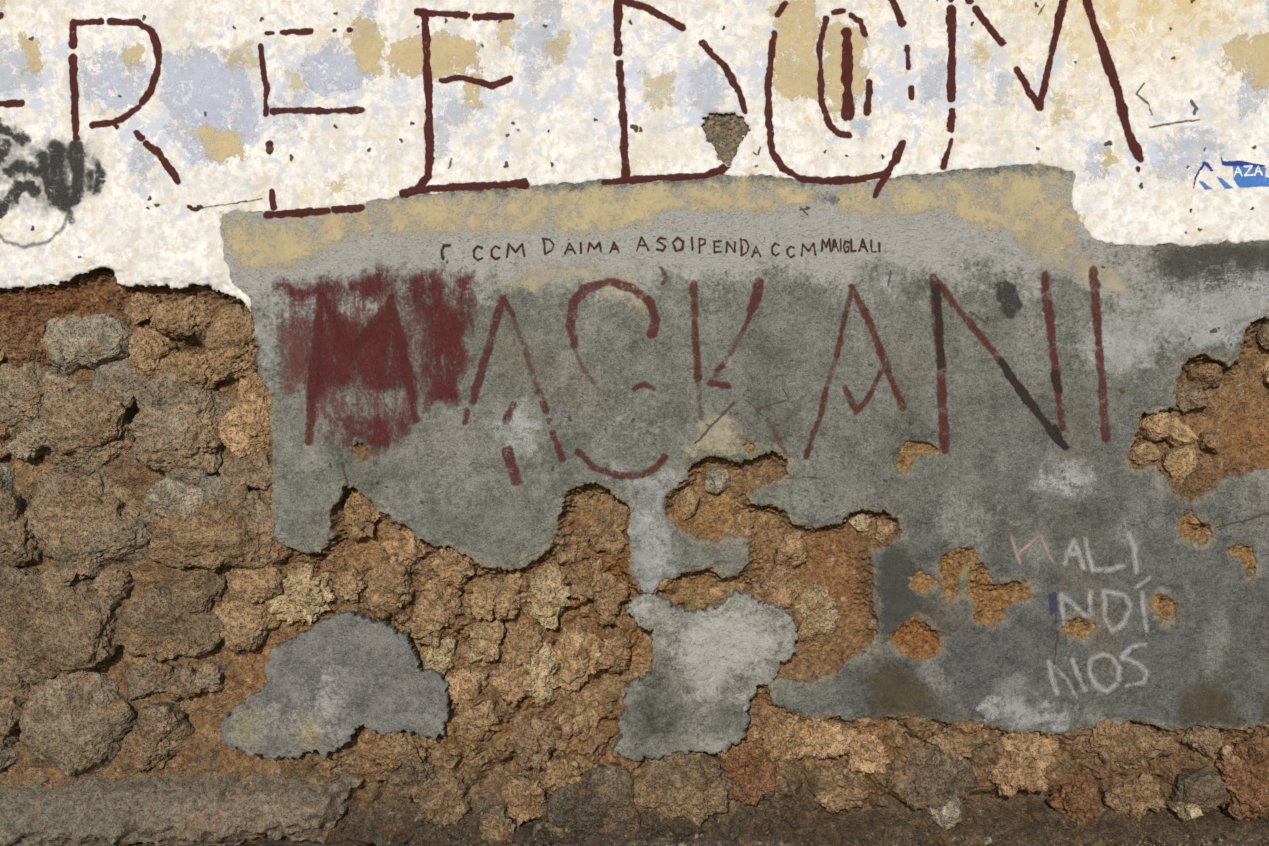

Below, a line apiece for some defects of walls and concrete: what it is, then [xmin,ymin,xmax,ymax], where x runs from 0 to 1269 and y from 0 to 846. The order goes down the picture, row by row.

peeling [222,61,1080,270]
spalling [1177,509,1213,545]
spalling [1228,544,1256,576]
spalling [909,547,1030,626]
spalling [890,616,942,660]